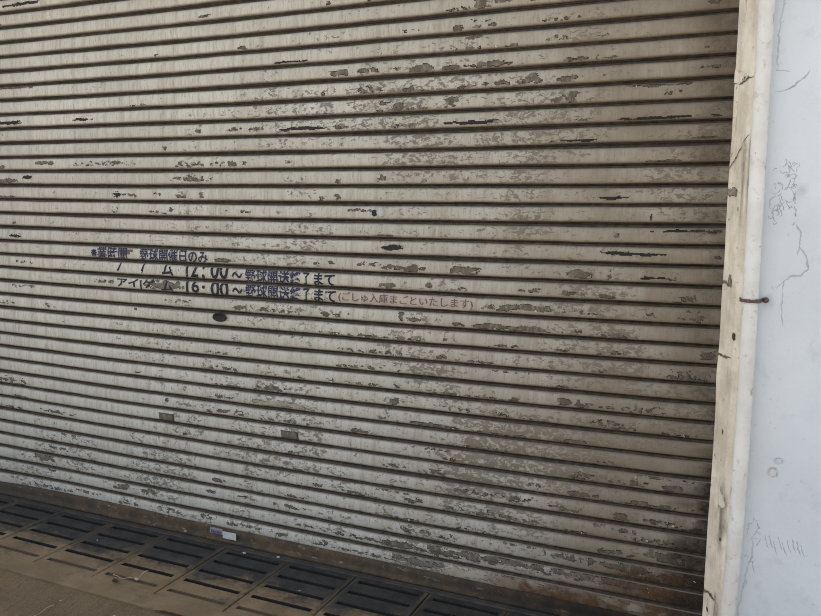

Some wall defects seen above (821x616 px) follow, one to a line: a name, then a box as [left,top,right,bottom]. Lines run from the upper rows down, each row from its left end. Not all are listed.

peeling [446,0,518,51]
peeling [328,67,379,77]
peeling [550,74,583,103]
peeling [170,161,247,182]
peeling [357,261,426,272]
peeling [451,322,550,333]
peeling [209,383,315,411]
peeling [410,421,459,430]
peeling [275,479,423,506]